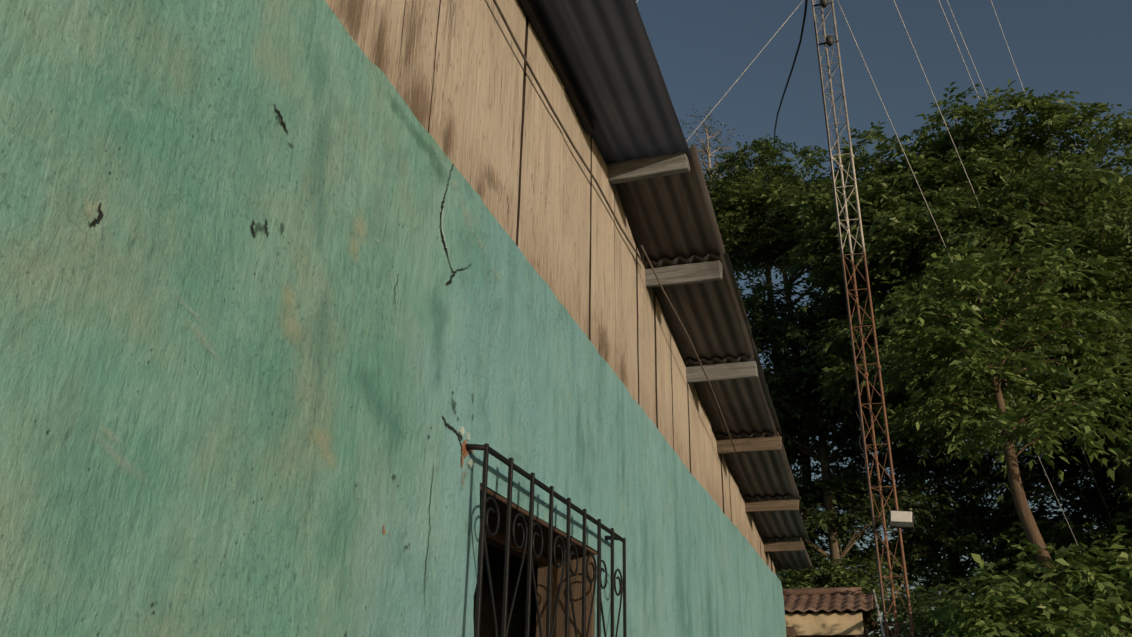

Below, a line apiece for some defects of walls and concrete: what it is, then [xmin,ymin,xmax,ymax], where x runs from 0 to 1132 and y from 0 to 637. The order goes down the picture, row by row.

crack [440,164,472,286]